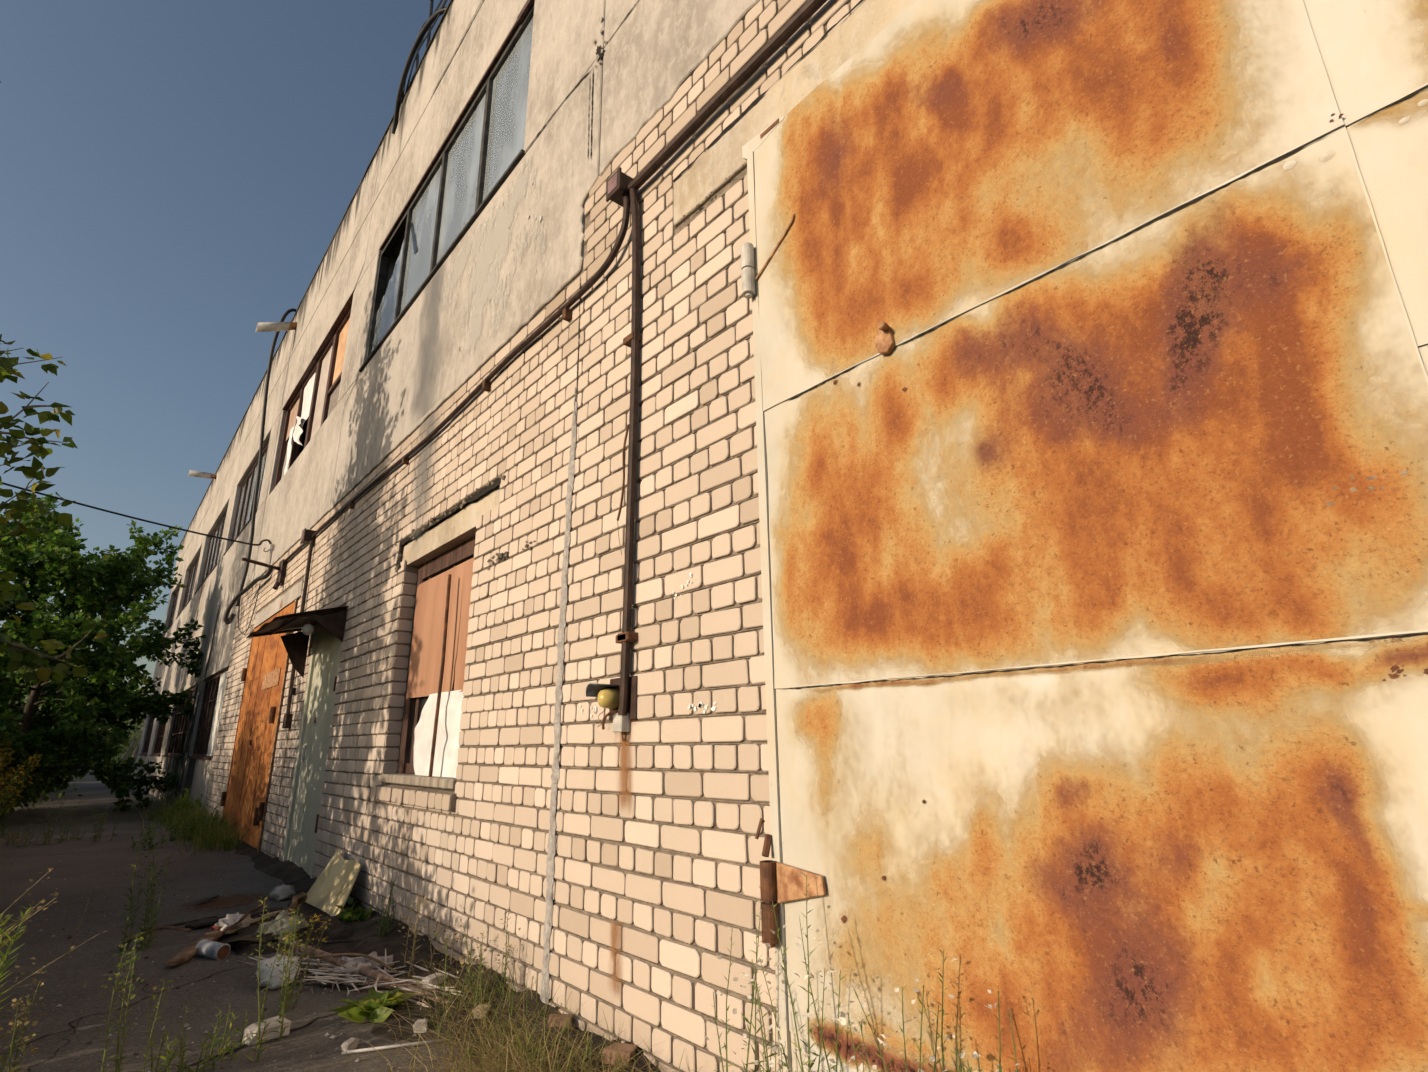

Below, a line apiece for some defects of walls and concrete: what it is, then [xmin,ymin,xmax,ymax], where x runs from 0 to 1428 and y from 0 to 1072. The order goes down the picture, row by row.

corrosion [774,0,1428,1072]